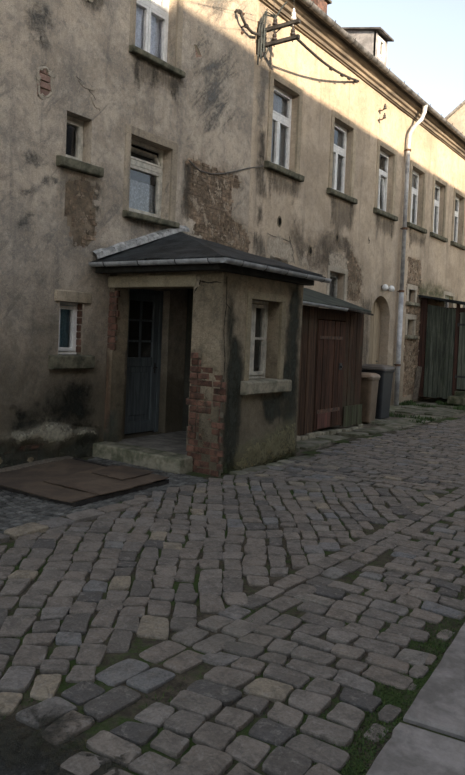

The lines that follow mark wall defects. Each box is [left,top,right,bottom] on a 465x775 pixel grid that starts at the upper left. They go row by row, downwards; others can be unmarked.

leakage [210,0,241,16]
flaking render [35,66,56,100]
leakage [194,57,233,131]
flaking render [64,177,101,248]
flaking render [183,155,251,253]
flaking render [403,256,422,397]
leakage [0,383,118,469]
flaking render [186,352,227,477]
leakage [223,303,242,471]